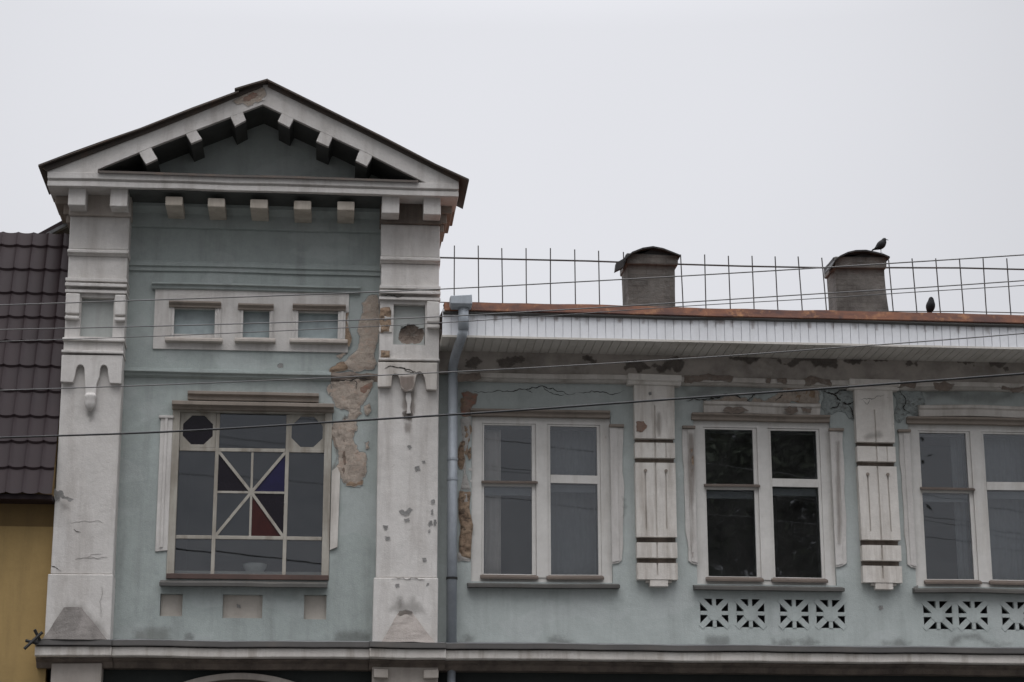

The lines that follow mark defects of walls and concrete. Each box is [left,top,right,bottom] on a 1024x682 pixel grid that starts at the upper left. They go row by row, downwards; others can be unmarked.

flaking render [327,294,425,487]
crack [336,365,422,388]
crack [475,386,622,396]
peeling [624,356,734,383]
peeling [729,356,761,364]
flaking render [711,358,887,415]
crack [822,390,910,418]
spalling [457,357,482,561]